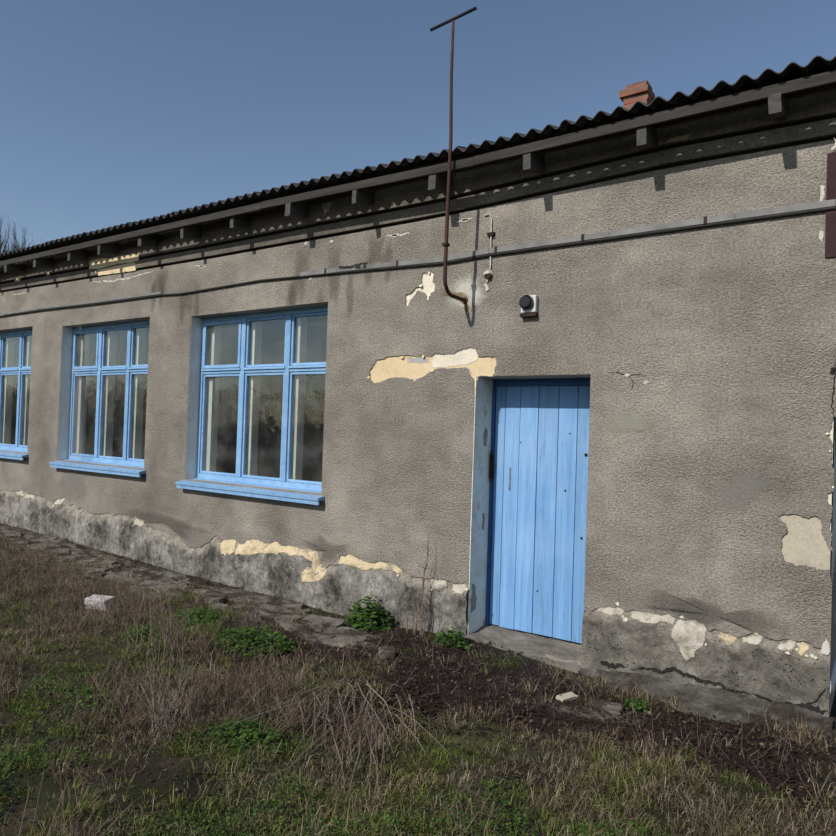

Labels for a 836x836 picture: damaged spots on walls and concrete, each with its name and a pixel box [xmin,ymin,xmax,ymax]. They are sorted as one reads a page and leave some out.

flaking render [89,253,152,283]
flaking render [406,271,435,306]
flaking render [367,347,496,394]
crack [828,362,836,417]
flaking render [778,418,836,587]
flaking render [598,602,707,660]
flaking render [718,631,764,645]
flaking render [778,639,830,659]